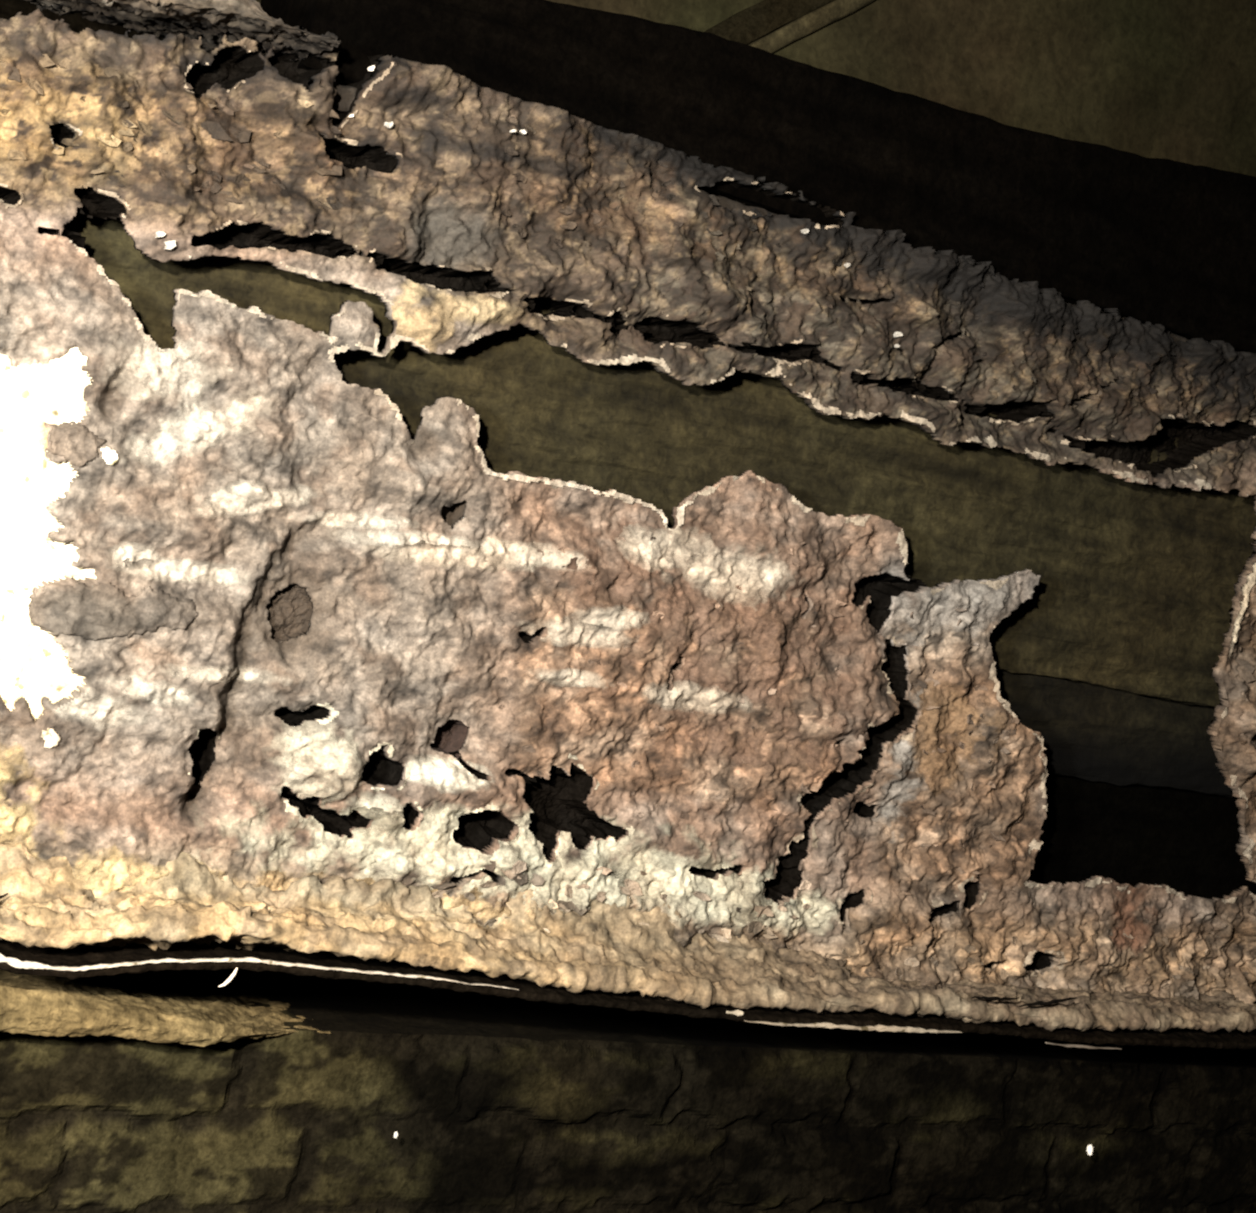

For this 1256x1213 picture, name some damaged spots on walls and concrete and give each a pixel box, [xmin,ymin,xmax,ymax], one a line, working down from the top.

spalling [501,116,995,348]
crack [191,220,1256,477]
peeling [0,347,97,748]
corrosion [0,749,23,783]
corrosion [0,788,38,859]
corrosion [75,851,170,898]
spalling [428,860,812,943]
spalling [498,578,847,826]
crack [689,636,917,907]
spalling [882,603,1041,897]
crack [972,996,1077,1007]
spalling [841,908,1256,993]